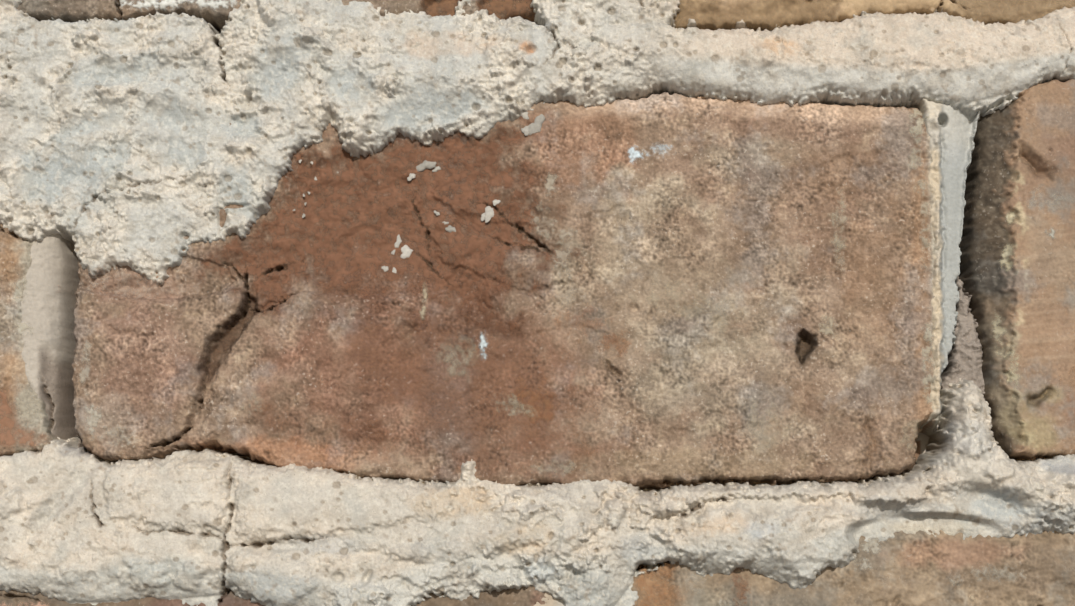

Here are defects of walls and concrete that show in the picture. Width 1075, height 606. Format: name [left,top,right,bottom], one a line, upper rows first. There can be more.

crack [414,206,439,276]
crack [492,205,551,253]
crack [227,265,287,319]
crack [150,401,204,448]